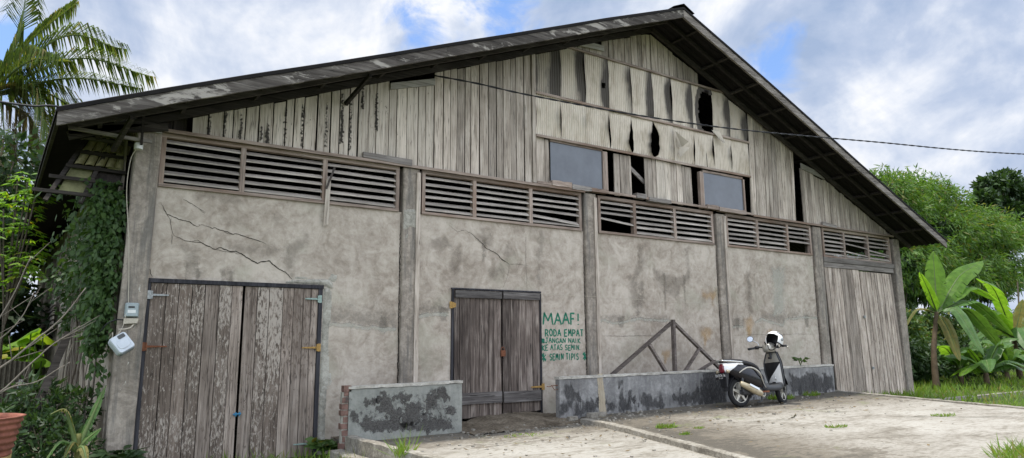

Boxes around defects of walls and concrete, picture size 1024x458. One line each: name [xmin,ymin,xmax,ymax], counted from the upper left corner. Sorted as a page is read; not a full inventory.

crack [162,201,292,279]